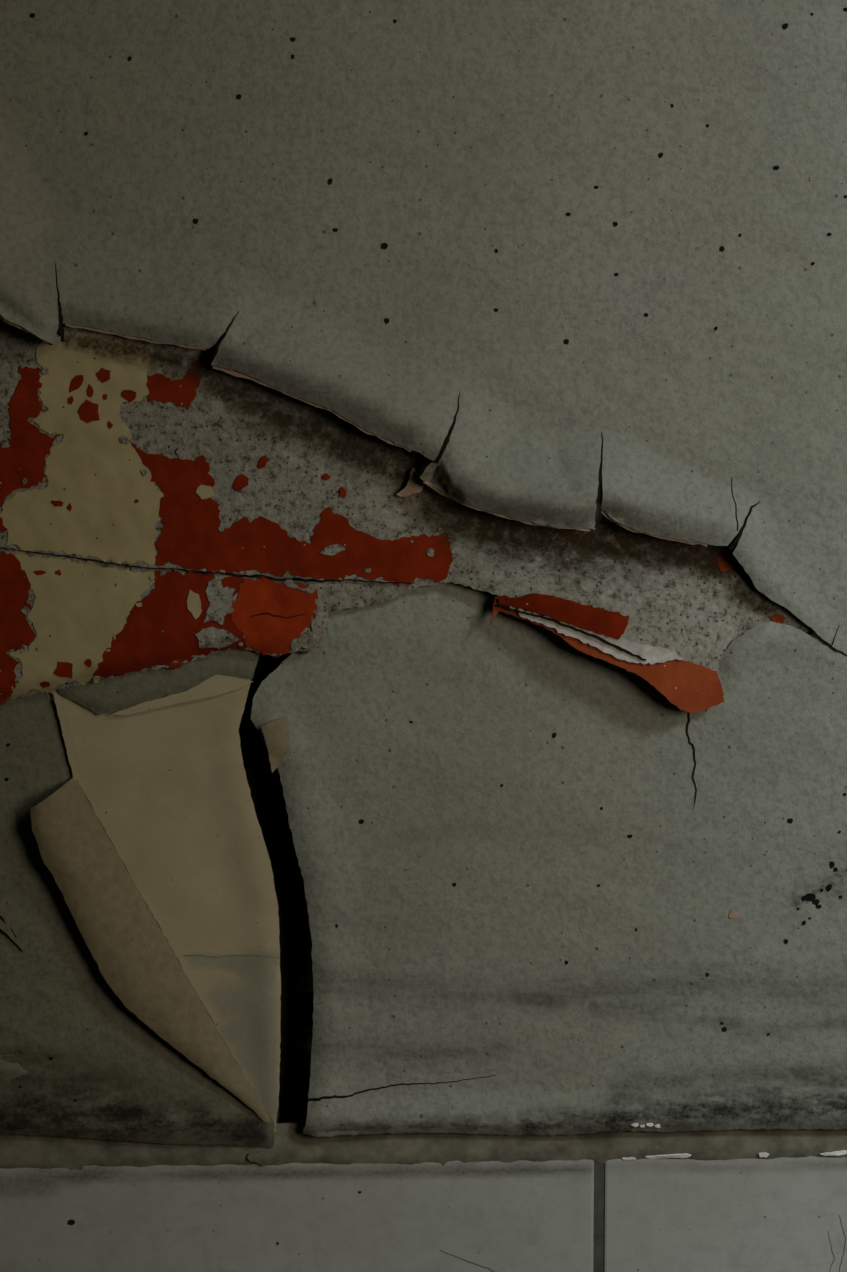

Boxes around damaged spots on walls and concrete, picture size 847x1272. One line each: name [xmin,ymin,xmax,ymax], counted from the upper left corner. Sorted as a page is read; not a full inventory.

peeling [0,89,847,653]
crack [0,547,414,584]
crack [249,611,308,619]
flaking render [0,319,813,1129]
crack [686,712,697,810]
crack [0,916,22,950]
damp [0,1098,266,1144]
damp [521,1094,847,1136]